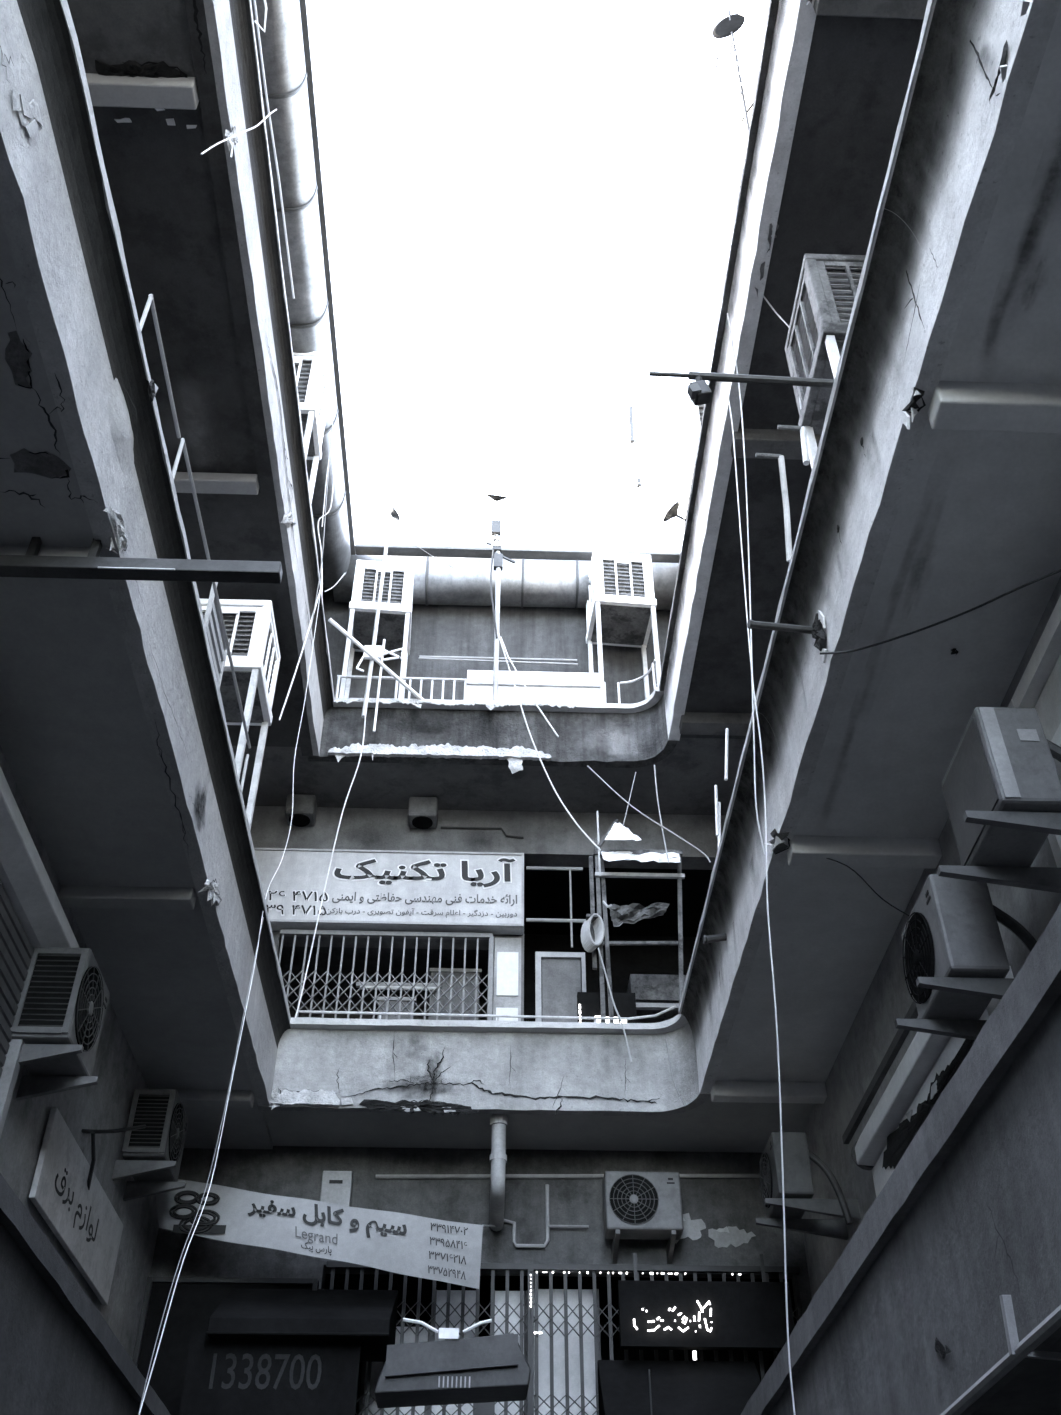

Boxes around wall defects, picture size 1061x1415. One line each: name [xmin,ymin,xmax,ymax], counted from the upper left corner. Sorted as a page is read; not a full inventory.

flaking render [5,331,33,389]
flaking render [10,448,71,479]
crack [280,1032,679,1116]